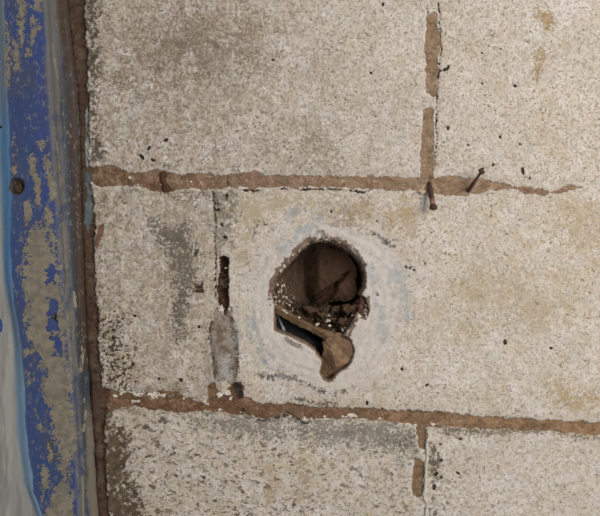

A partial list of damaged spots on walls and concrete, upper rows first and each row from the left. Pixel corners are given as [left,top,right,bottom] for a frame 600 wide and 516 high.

peeling [3,0,44,89]
peeling [16,126,87,516]
crack [212,191,227,296]
spalling [267,235,379,352]